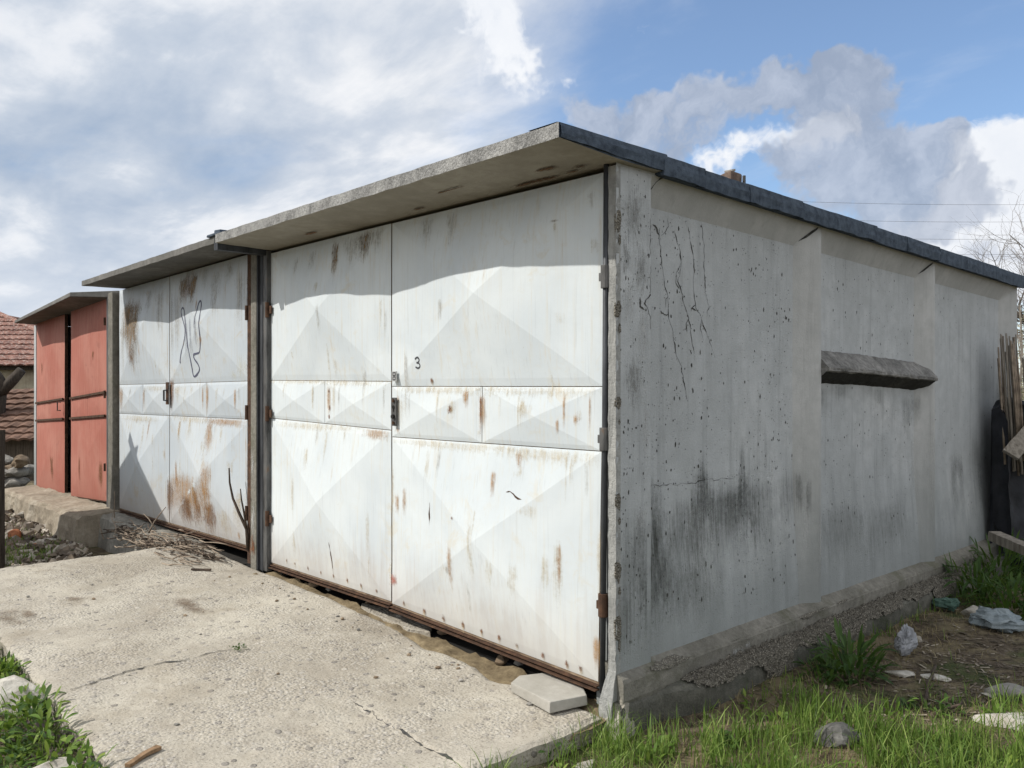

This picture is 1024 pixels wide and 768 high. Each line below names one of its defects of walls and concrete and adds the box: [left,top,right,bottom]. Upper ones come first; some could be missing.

crack [640,219,715,397]
corrosion [168,471,216,525]
spalling [648,556,997,688]